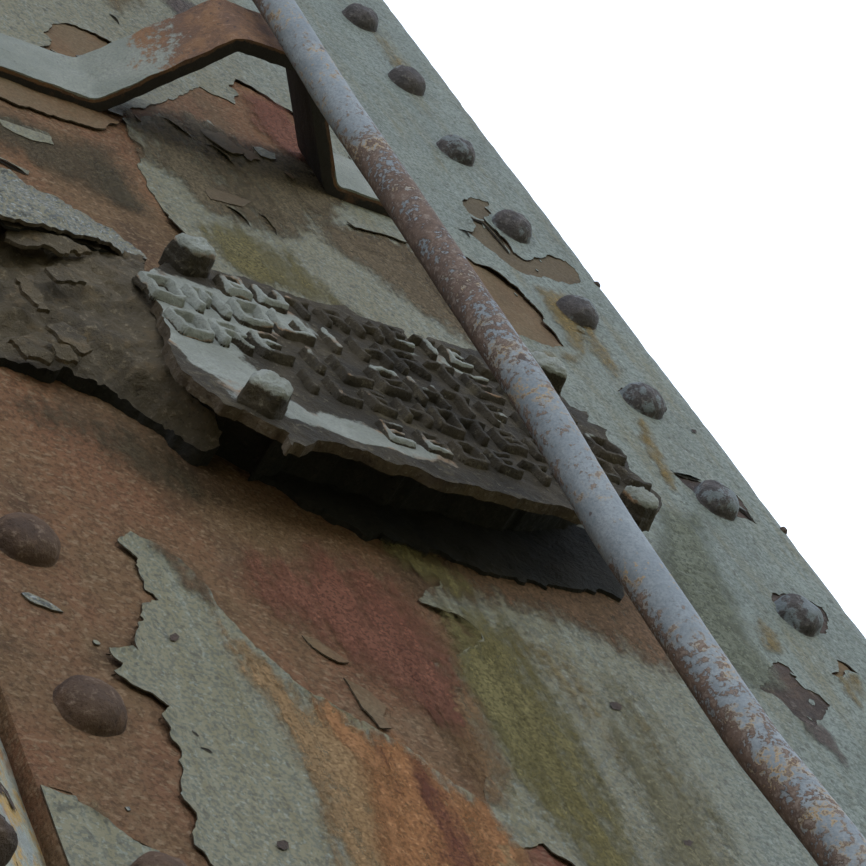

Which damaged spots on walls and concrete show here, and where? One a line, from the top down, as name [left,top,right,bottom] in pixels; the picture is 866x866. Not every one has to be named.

peeling [44,24,107,57]
peeling [0,77,311,272]
peeling [347,221,407,243]
peeling [462,198,581,284]
peeling [0,367,485,866]
corrosion [413,553,676,672]
corrosion [219,622,529,866]
peeling [760,663,829,724]